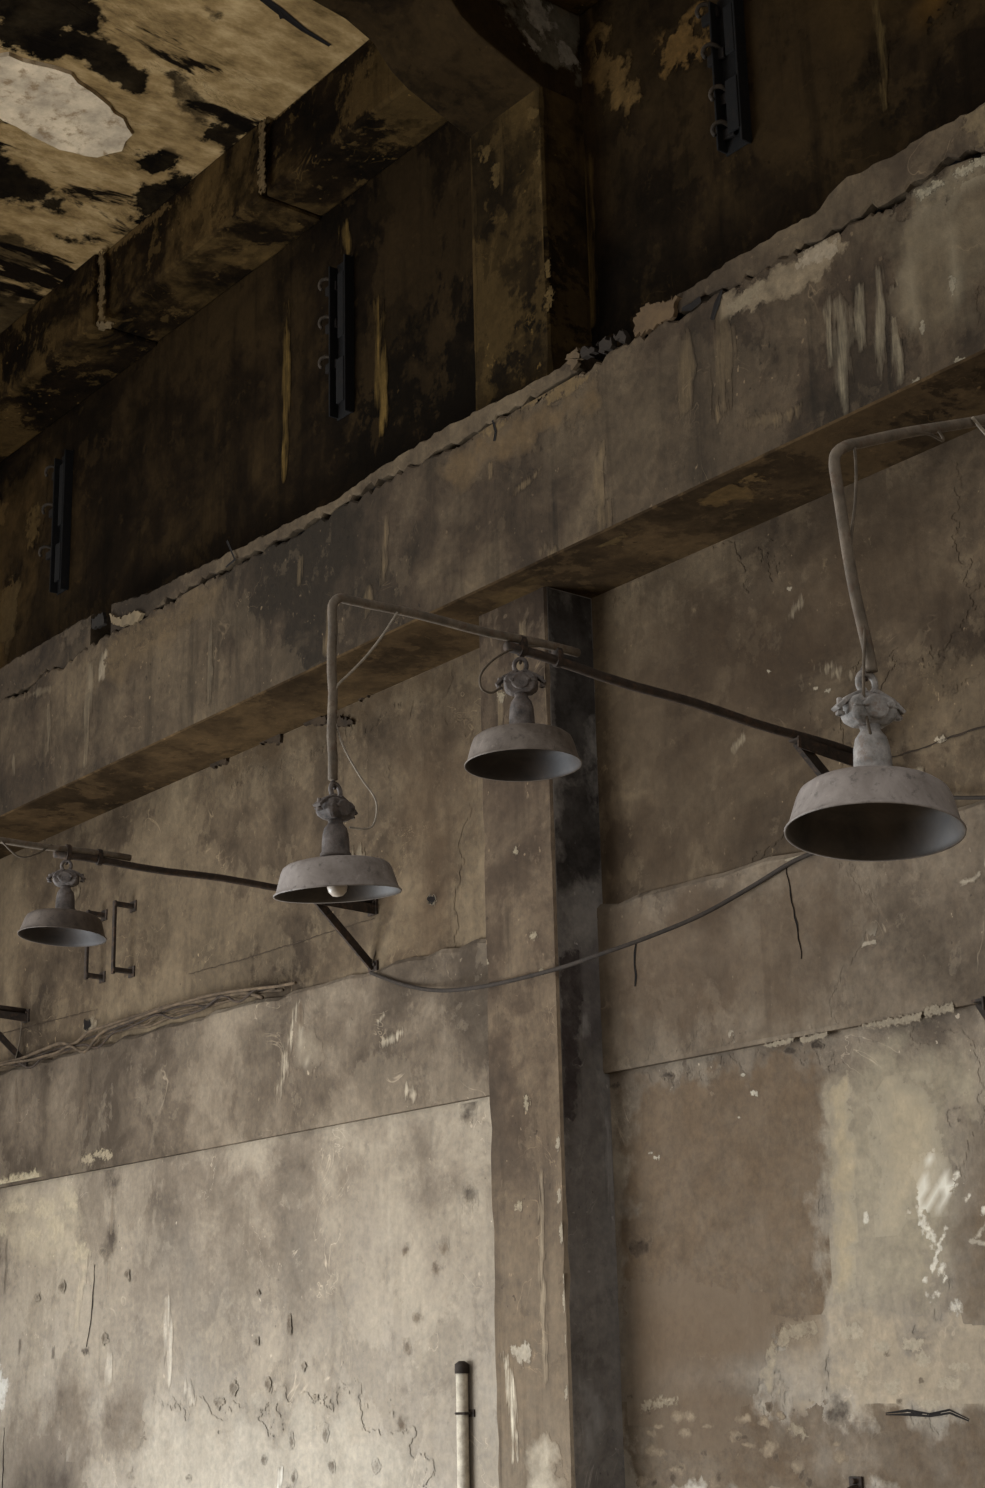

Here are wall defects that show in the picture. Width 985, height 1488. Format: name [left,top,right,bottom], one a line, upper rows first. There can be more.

peeling [0,52,133,157]
flaking render [495,0,643,133]
peeling [652,0,710,81]
crack [922,152,983,185]
water stain [338,217,352,255]
crack [681,290,723,320]
water stain [822,174,985,418]
water stain [280,296,292,484]
water stain [373,295,391,438]
crack [215,481,386,577]
flaking render [0,1363,11,1412]
peeling [619,1257,985,1488]